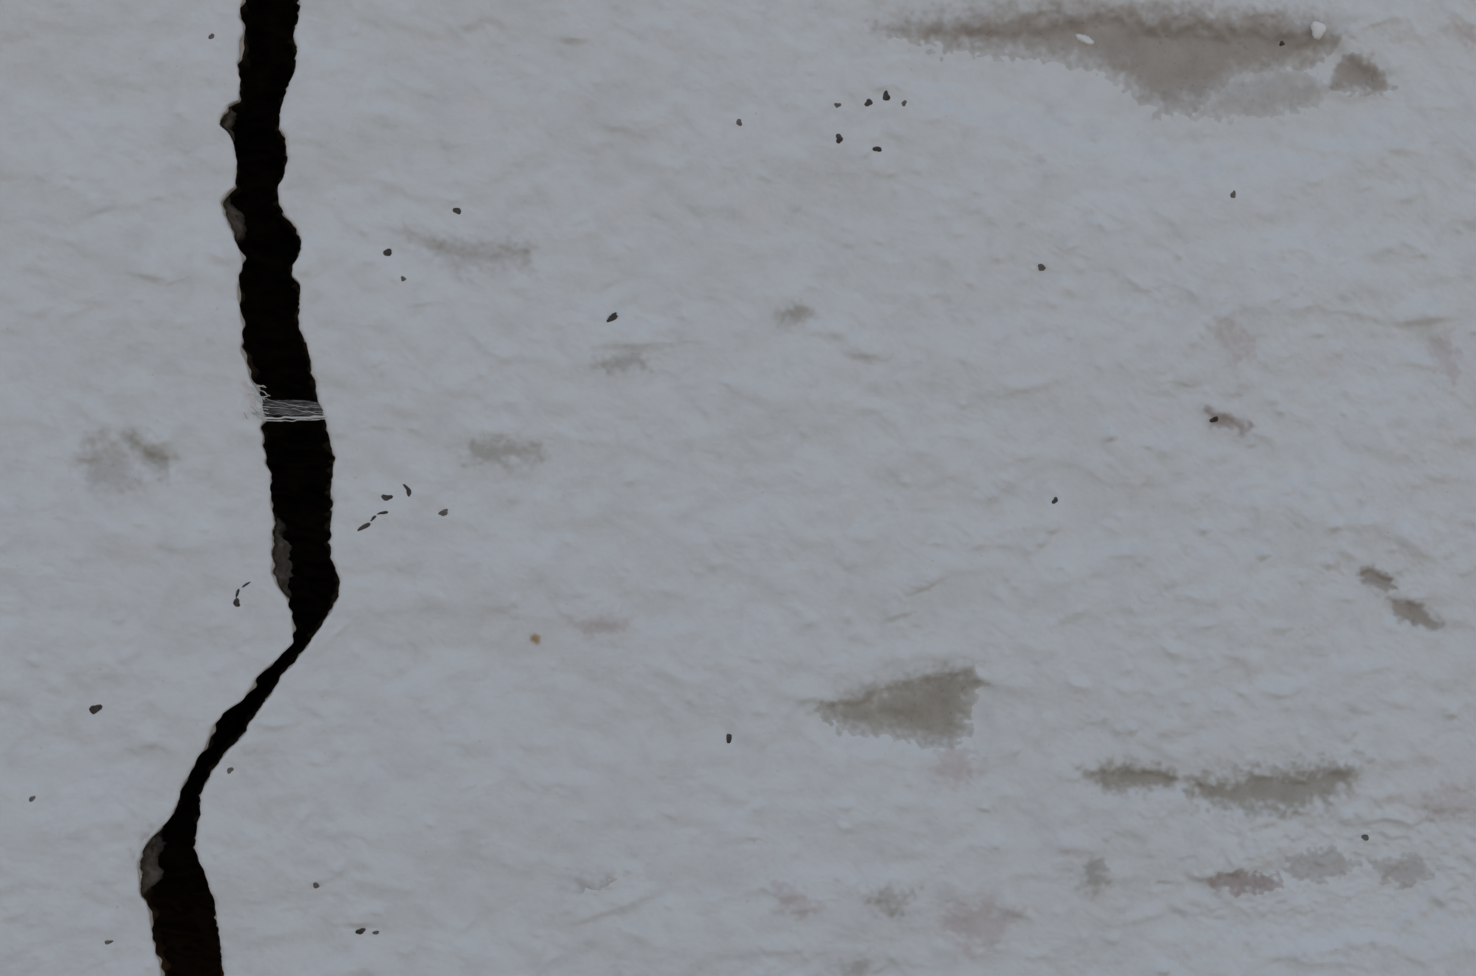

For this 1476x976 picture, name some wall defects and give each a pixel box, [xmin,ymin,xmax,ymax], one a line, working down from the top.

flaking render [851,0,1413,211]
crack [137,0,340,976]
flaking render [799,650,1004,773]